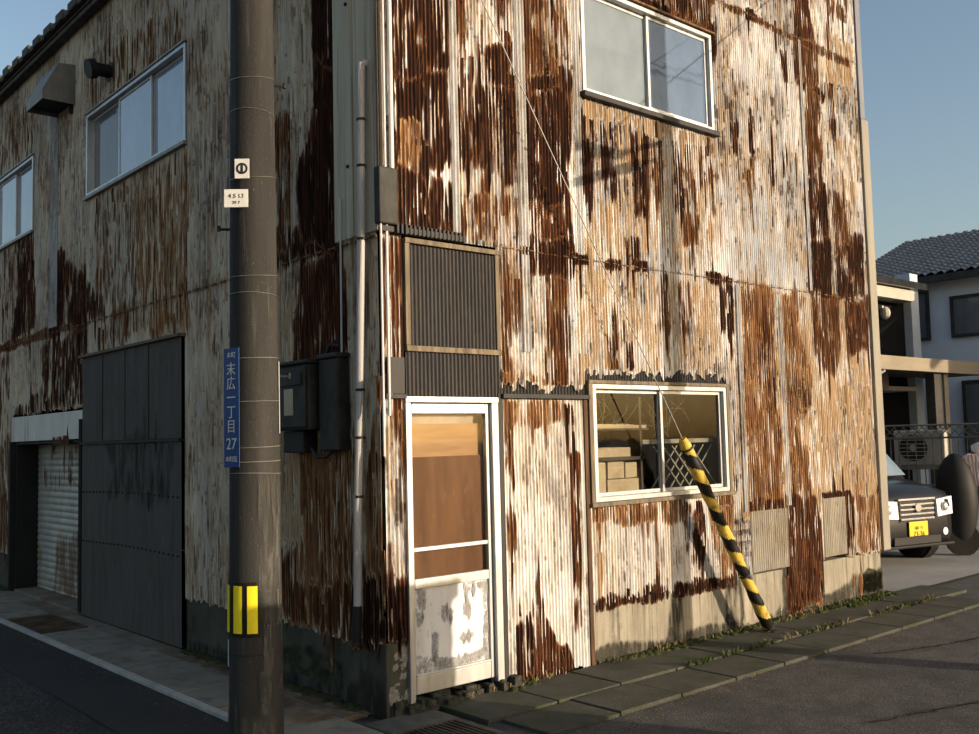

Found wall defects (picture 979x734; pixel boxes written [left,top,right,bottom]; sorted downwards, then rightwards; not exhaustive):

corrosion [55,534,78,599]
corrosion [0,149,190,568]
water stain [228,474,387,734]
corrosion [274,0,350,363]
corrosion [279,235,409,670]
peeling [389,579,490,706]
corrosion [391,0,881,681]